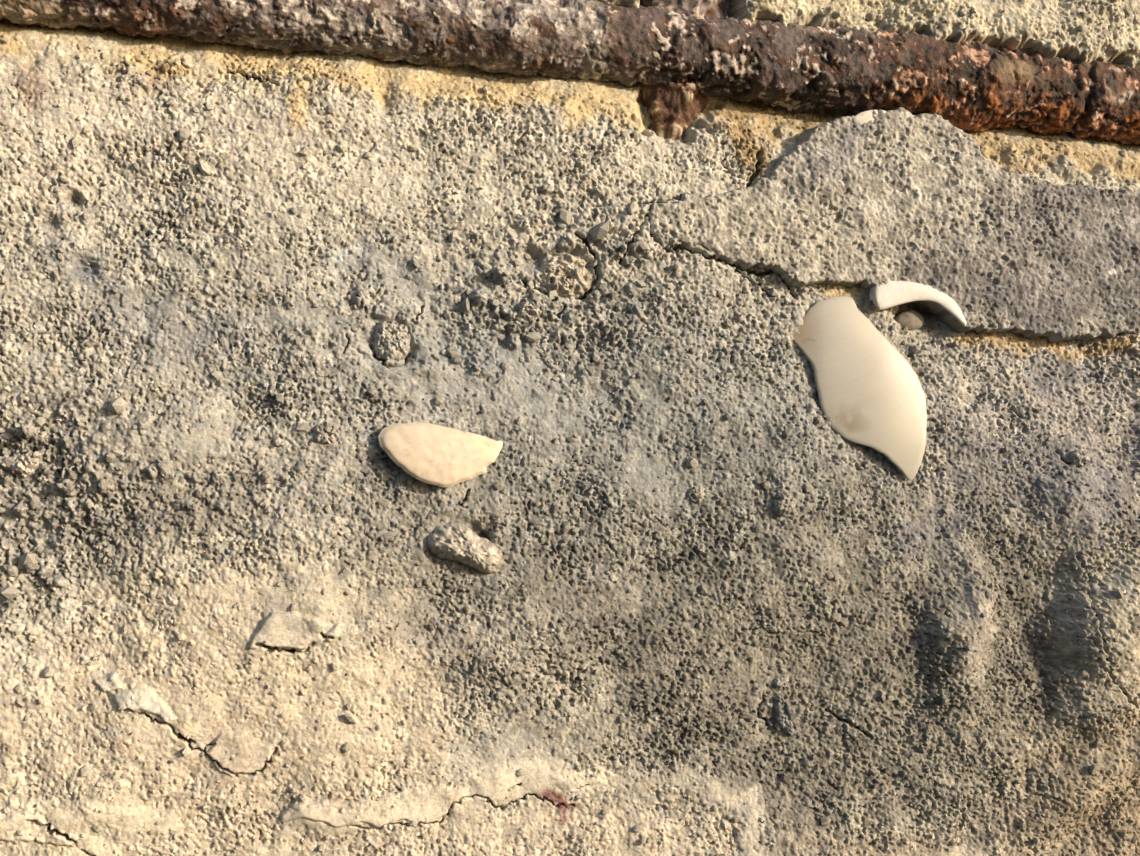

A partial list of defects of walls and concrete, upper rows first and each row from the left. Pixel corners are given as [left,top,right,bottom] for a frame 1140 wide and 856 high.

rust [0,0,1140,193]
crack [522,194,795,318]
crack [126,709,277,775]
crack [361,783,589,830]